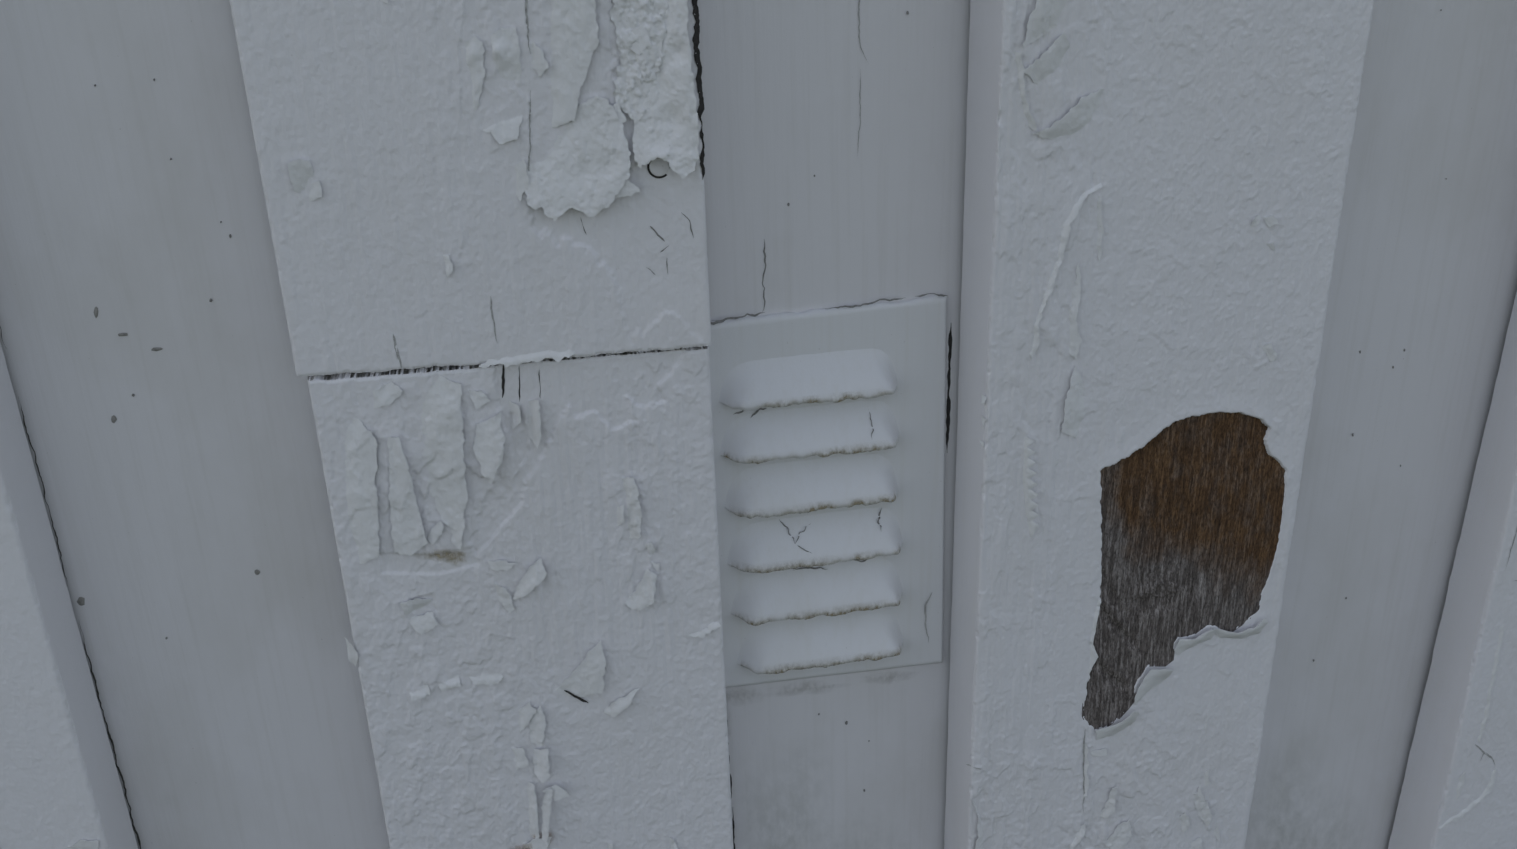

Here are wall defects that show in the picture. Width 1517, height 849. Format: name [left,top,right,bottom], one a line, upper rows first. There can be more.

peeling [483,115,523,144]
peeling [515,0,699,221]
crack [857,0,867,156]
crack [711,241,766,325]
peeling [479,350,577,369]
peeling [343,375,541,564]
peeling [616,477,660,610]
peeling [1082,412,1285,757]
peeling [410,673,503,701]
peeling [555,639,639,717]
peeling [511,702,569,849]